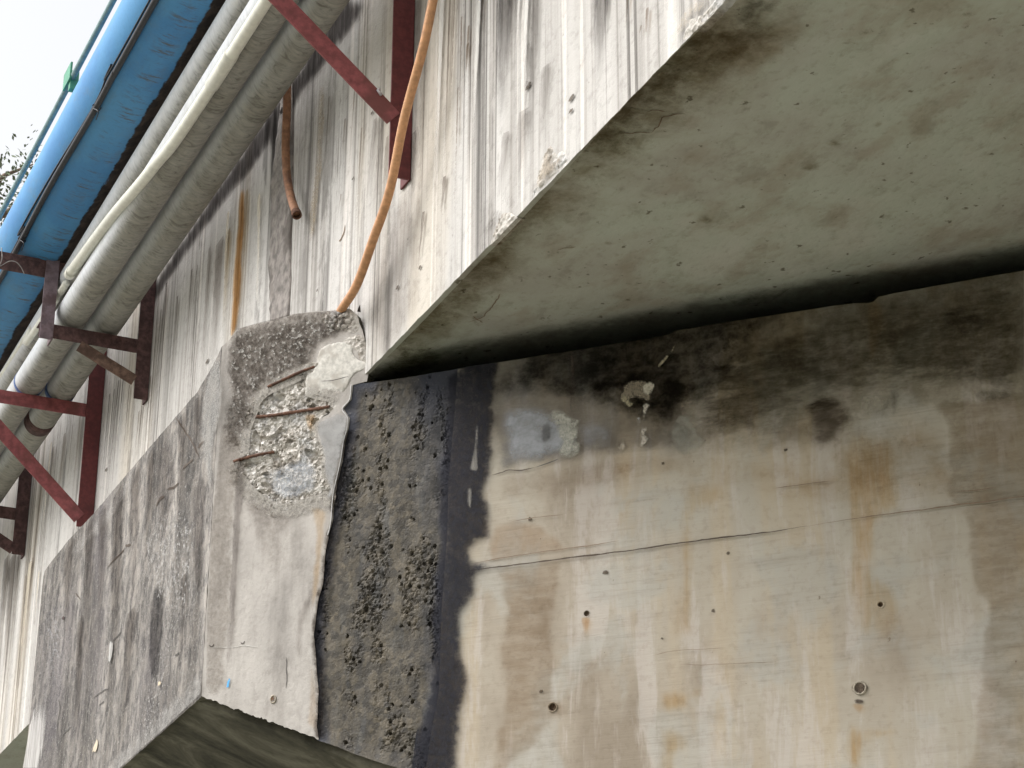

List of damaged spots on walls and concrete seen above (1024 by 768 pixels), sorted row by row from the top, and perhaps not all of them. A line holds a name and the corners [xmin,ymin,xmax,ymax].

spalling [320,311,366,363]
spalling [229,362,352,536]
peeling [621,381,654,446]
water stain [369,249,1024,768]
crack [469,487,1024,570]